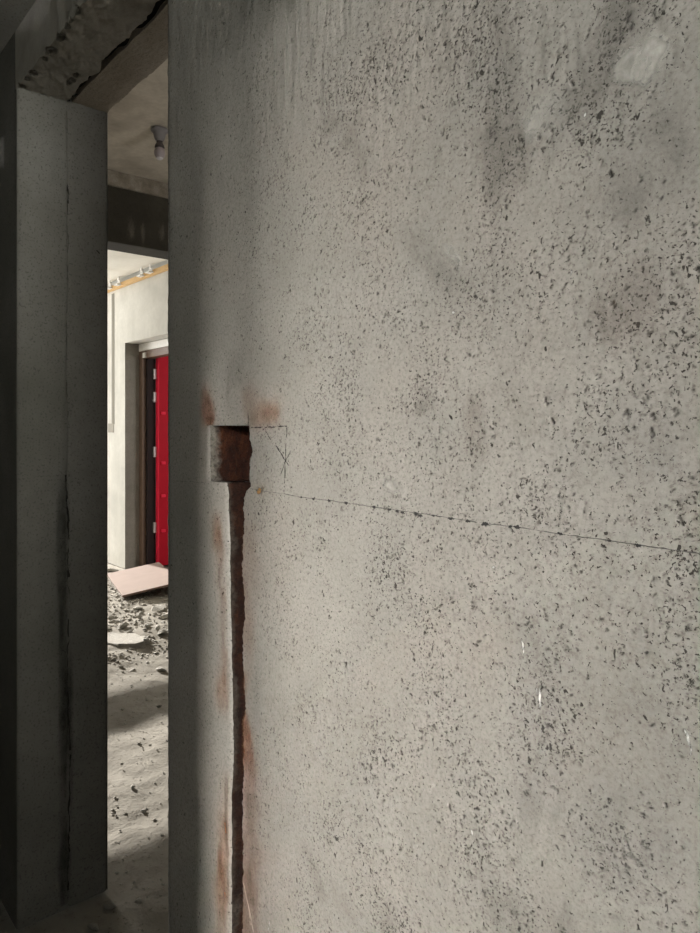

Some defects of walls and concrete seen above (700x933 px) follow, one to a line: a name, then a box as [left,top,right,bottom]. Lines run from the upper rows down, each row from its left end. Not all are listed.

crack [62,475,71,891]